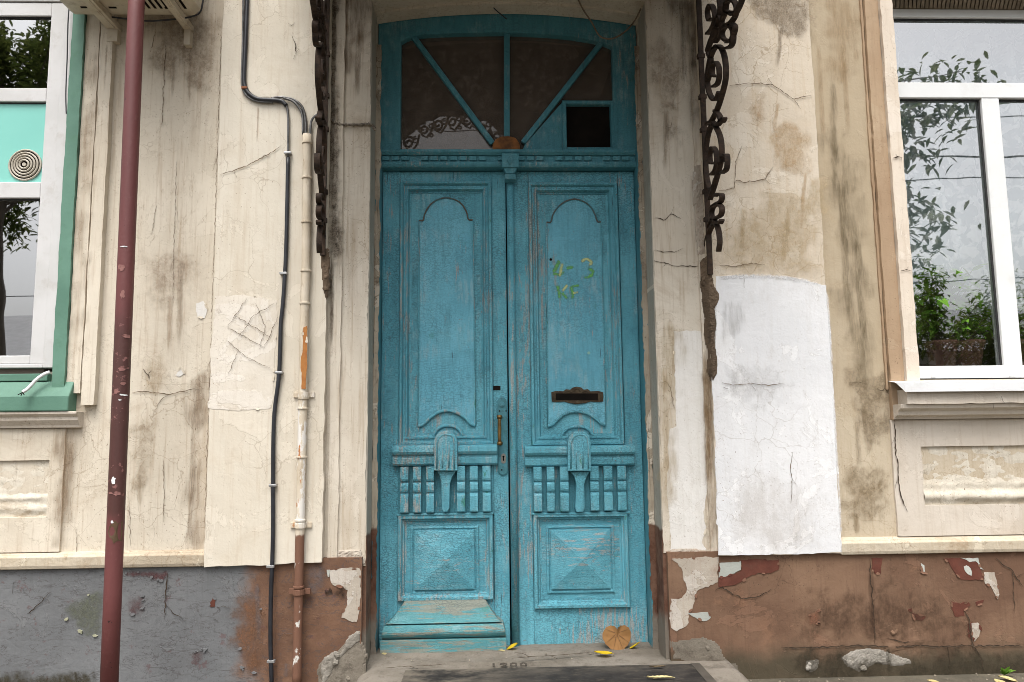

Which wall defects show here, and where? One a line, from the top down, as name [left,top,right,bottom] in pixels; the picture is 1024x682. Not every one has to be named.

crack [730,81,811,104]
crack [719,146,771,191]
crack [134,32,279,529]
crack [892,424,907,510]
spalling [317,549,368,682]
flaking render [669,548,780,671]
peeling [944,557,999,642]